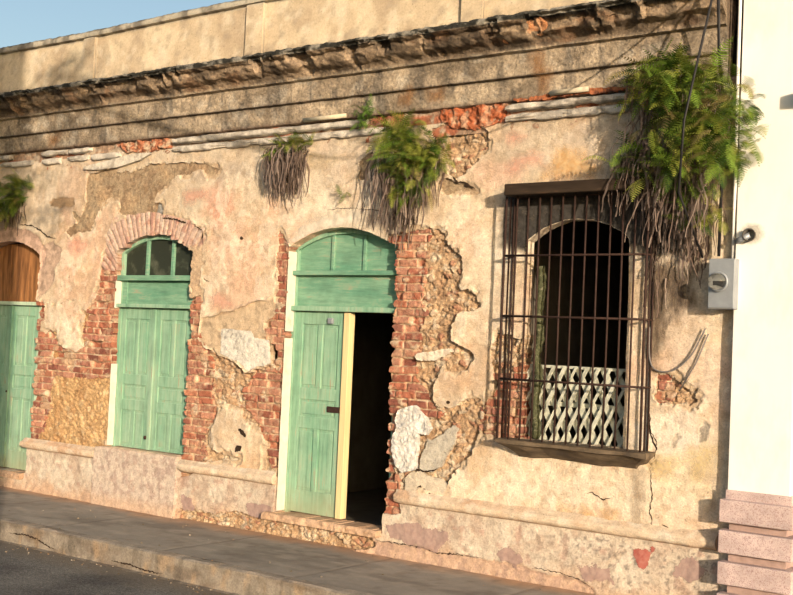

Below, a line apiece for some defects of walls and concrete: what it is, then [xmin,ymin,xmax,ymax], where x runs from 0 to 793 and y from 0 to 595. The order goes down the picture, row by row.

flaking render [30,162,298,477]
flaking render [384,228,534,515]
crack [649,417,668,528]
flaking render [654,373,698,406]